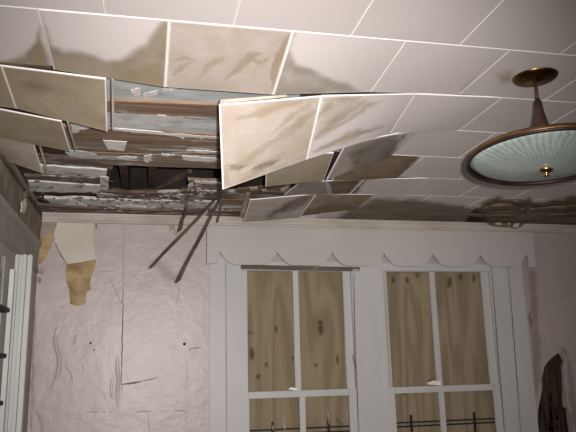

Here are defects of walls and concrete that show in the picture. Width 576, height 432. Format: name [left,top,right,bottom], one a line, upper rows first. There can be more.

damp [0,22,209,152]
spalling [103,140,137,160]
peeling [110,127,220,139]
peeling [182,149,221,162]
damp [221,106,244,147]
damp [223,135,263,187]
damp [246,36,576,225]
peeling [164,180,222,208]
flaking render [39,222,57,264]
flaking render [65,260,96,306]
crack [100,231,158,390]
spalling [536,352,568,432]